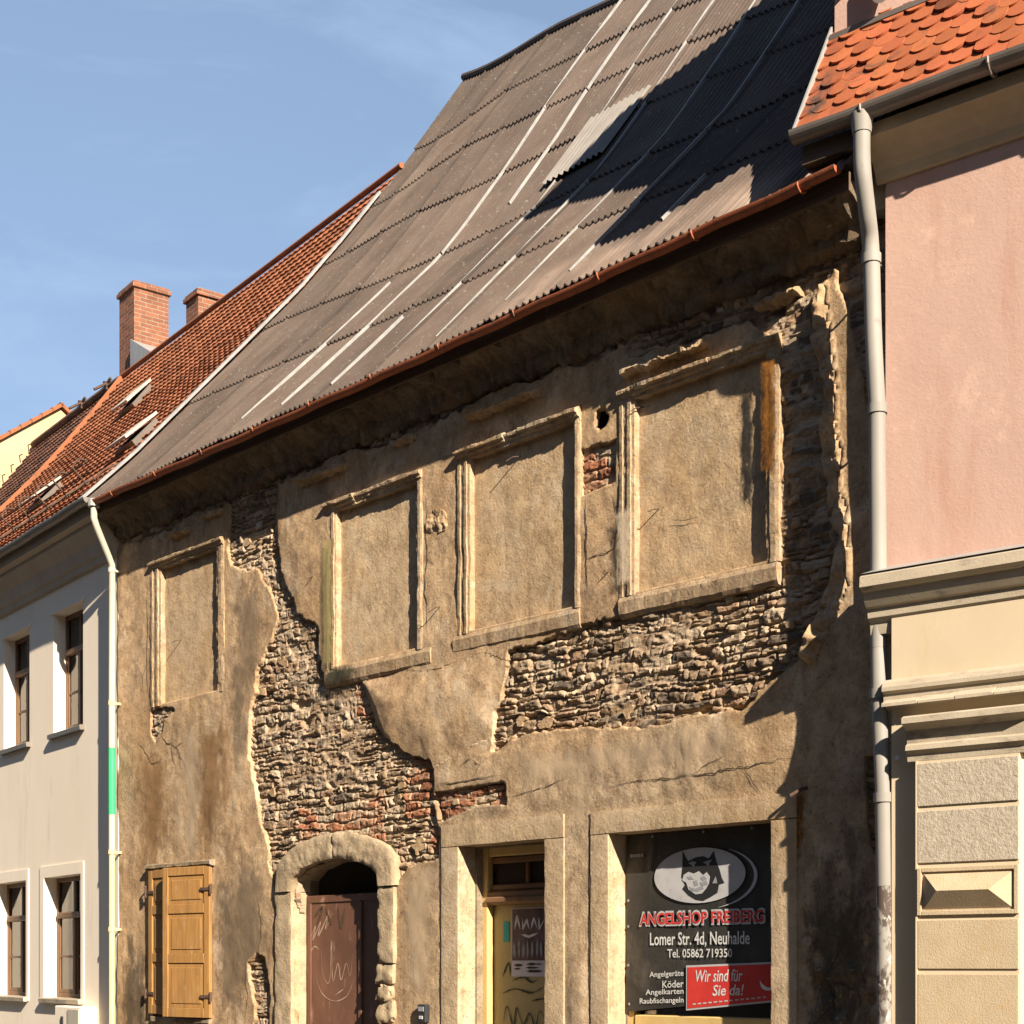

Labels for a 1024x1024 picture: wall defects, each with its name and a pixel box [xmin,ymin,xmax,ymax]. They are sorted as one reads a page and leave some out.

spalling [877,218,886,401]
spalling [344,399,479,453]
spalling [493,249,868,751]
spalling [120,462,506,913]
crack [610,755,791,791]
spalling [248,955,270,1024]